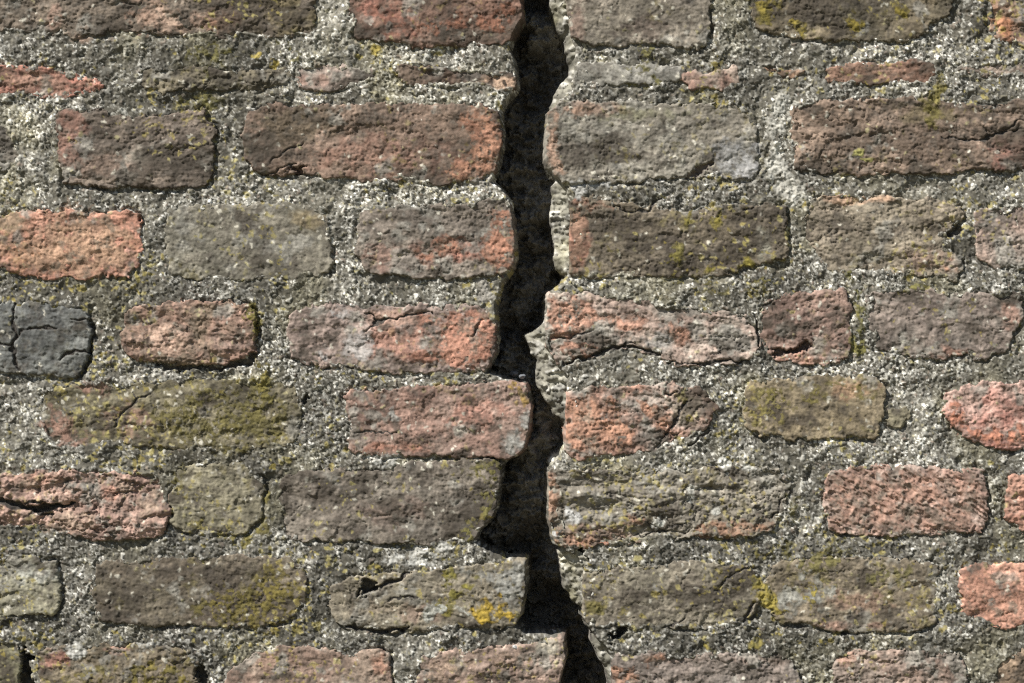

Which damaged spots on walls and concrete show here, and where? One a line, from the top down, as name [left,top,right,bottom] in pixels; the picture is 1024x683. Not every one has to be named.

crack [364,312,434,328]
crack [472,0,772,683]
crack [771,488,791,517]